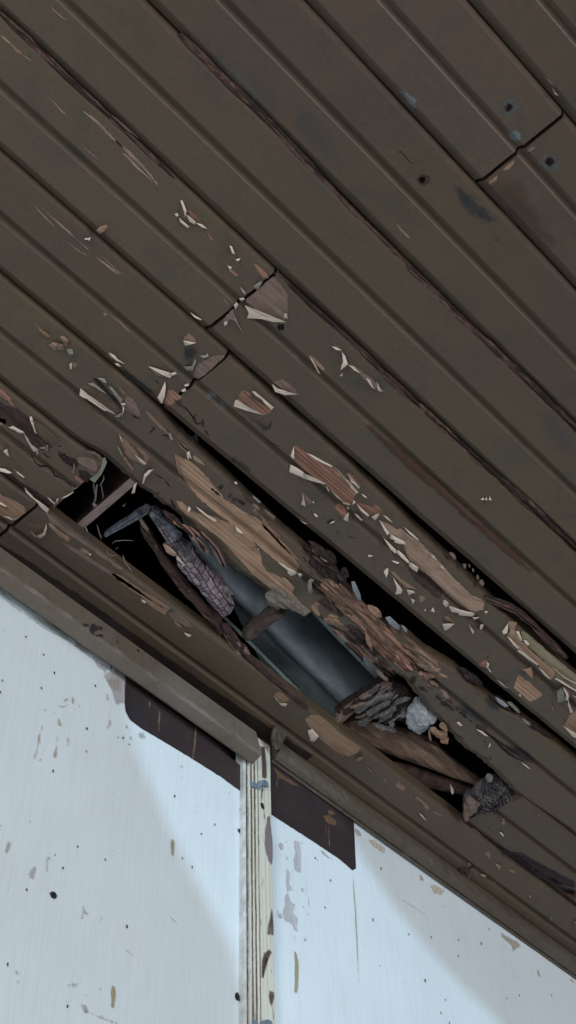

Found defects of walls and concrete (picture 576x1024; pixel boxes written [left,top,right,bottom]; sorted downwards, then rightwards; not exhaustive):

peeling [175,200,213,240]
peeling [223,245,288,334]
peeling [148,353,225,406]
peeling [183,333,196,346]
peeling [308,354,325,374]
peeling [330,340,383,392]
peeling [0,389,192,637]
peeling [290,445,488,634]
peeling [478,621,576,738]
peeling [95,661,240,790]
peeling [304,715,372,772]
peeling [260,747,385,940]